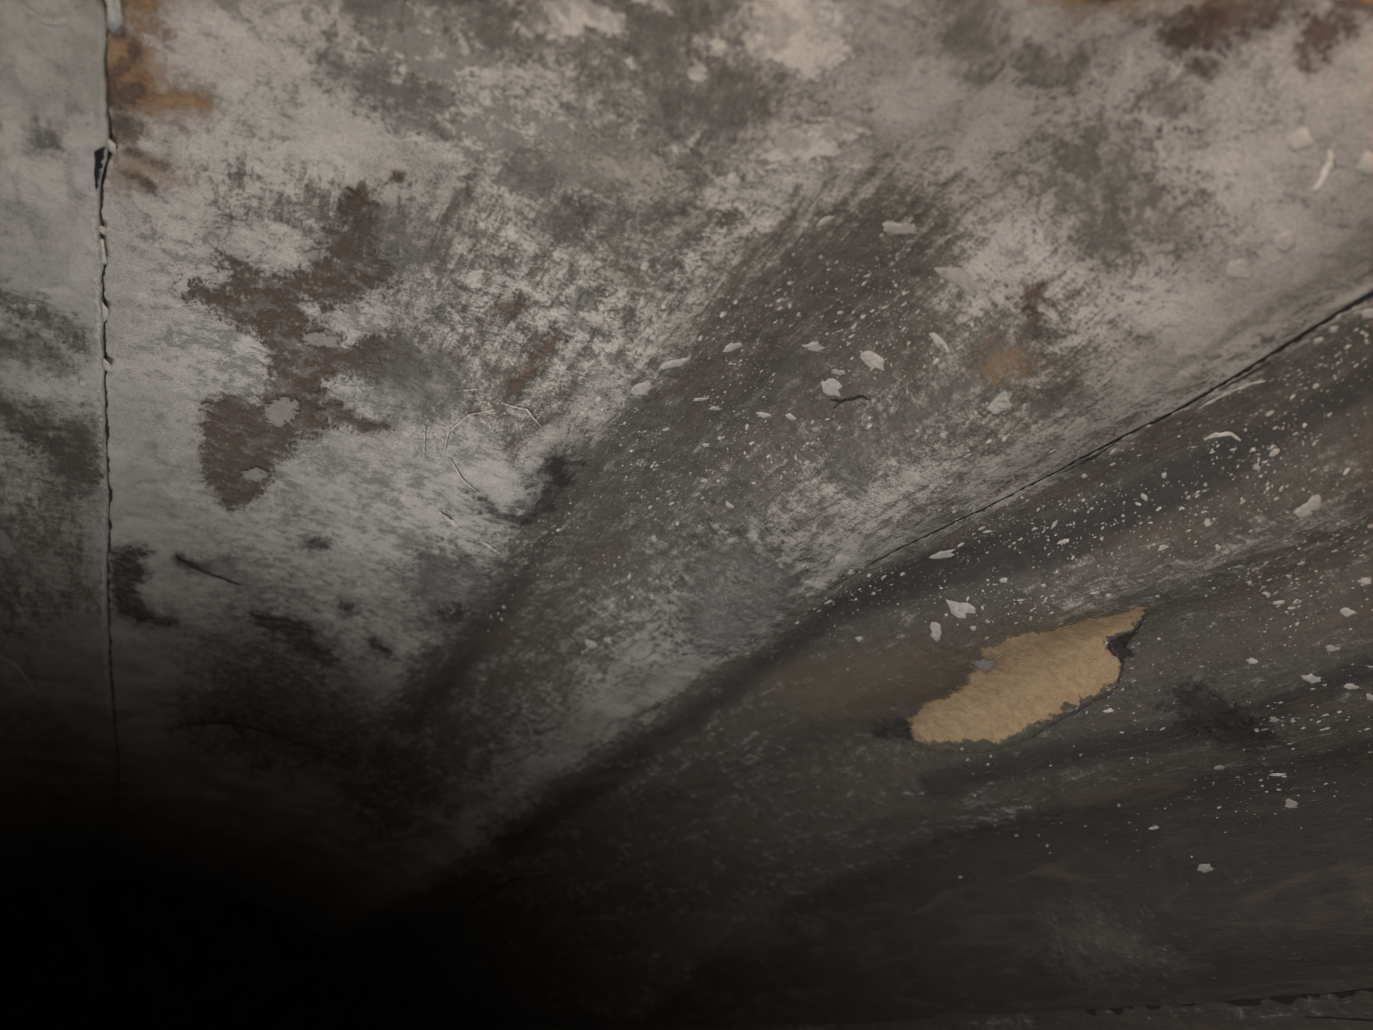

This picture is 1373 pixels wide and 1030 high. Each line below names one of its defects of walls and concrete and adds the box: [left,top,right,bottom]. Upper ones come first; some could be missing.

rust [106,20,212,197]
leakage [293,0,874,251]
rust [1292,0,1373,74]
crack [100,0,120,839]
leakage [458,444,589,529]
crack [828,291,1373,590]
crack [175,555,275,621]
peeling [860,595,1160,753]